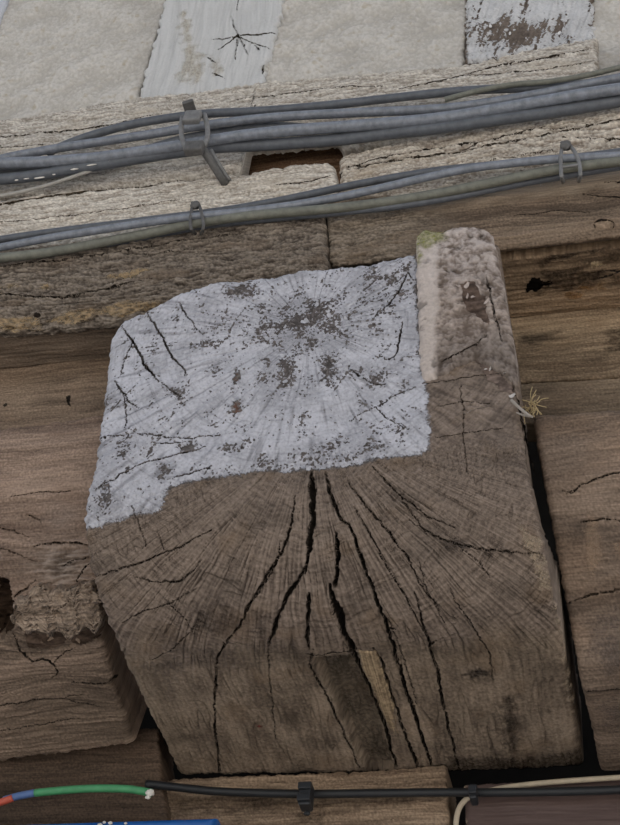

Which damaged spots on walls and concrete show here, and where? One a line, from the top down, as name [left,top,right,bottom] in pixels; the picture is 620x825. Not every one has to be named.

crack [208,0,275,79]
crack [236,49,595,100]
spalling [51,300,157,324]
peeling [258,301,348,346]
crack [96,329,220,490]
crack [424,279,536,475]
crack [372,466,542,576]
spalling [0,576,15,639]
crack [0,634,118,731]
spalling [24,629,102,649]
crack [0,491,212,660]
crack [213,472,493,773]